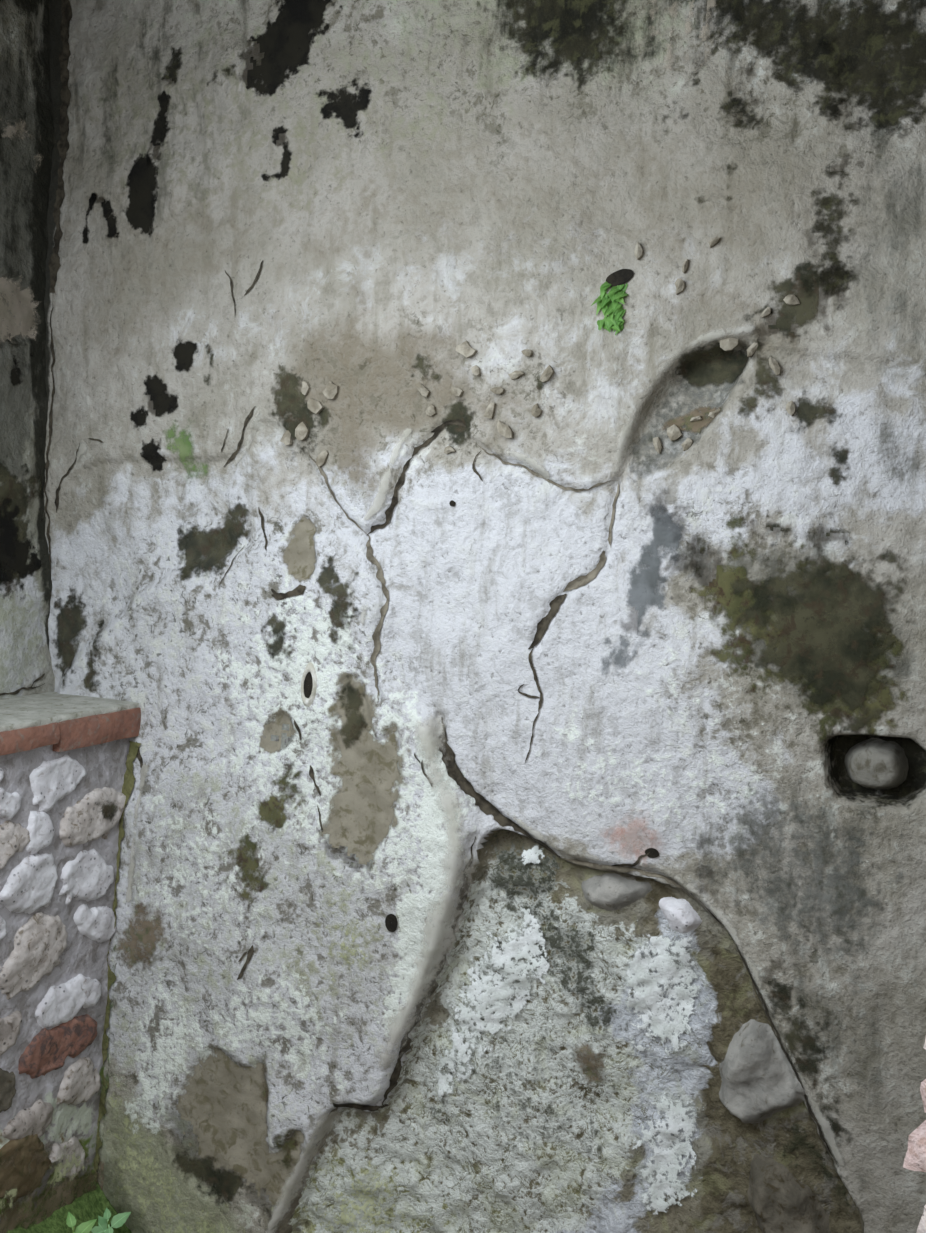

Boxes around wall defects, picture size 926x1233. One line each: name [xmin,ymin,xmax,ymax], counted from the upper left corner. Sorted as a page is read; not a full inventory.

damp [207,0,343,96]
damp [318,79,371,137]
damp [651,0,926,136]
peeling [675,259,689,295]
peeling [783,295,800,305]
peeling [614,307,771,476]
damp [0,461,43,597]
crack [218,507,267,591]
crack [271,585,306,600]
crack [308,419,619,763]
spalling [319,672,409,865]
crack [275,717,844,1233]